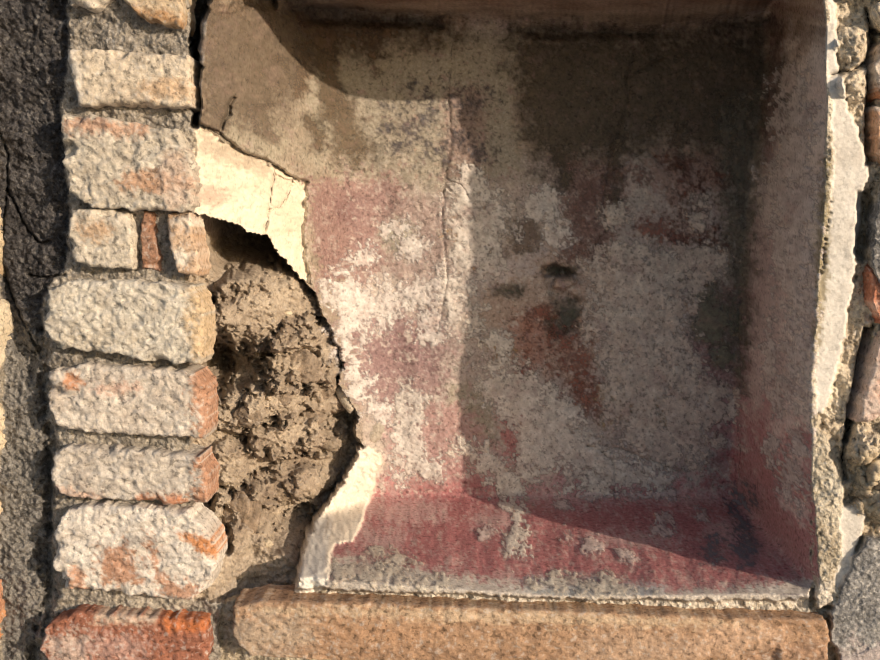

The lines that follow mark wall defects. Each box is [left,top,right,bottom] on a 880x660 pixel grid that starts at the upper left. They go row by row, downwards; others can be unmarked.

crack [199,112,298,229]
water stain [196,0,463,170]
water stain [377,78,502,167]
spalling [186,115,741,604]
spalling [751,0,880,655]